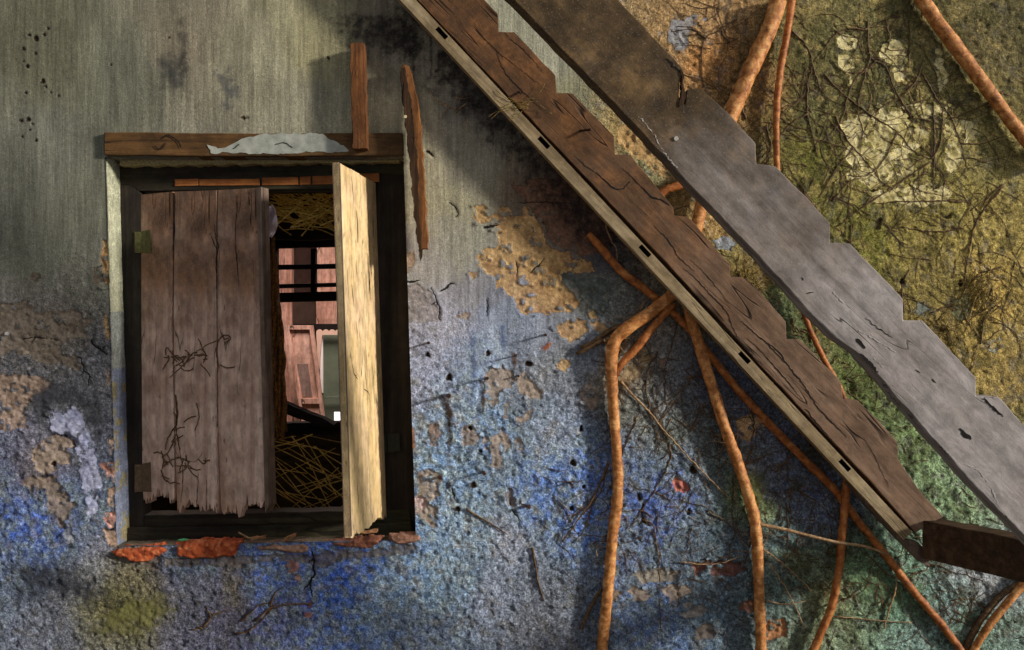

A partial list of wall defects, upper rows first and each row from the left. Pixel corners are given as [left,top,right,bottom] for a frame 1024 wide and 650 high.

flaking render [99,240,110,286]
flaking render [467,176,615,343]
flaking render [0,372,51,433]
flaking render [428,422,443,452]
flaking render [460,350,543,470]
flaking render [21,434,77,545]
flaking render [100,438,421,582]
flaking render [415,468,443,532]
flaking render [505,488,527,508]
crack [303,551,316,597]